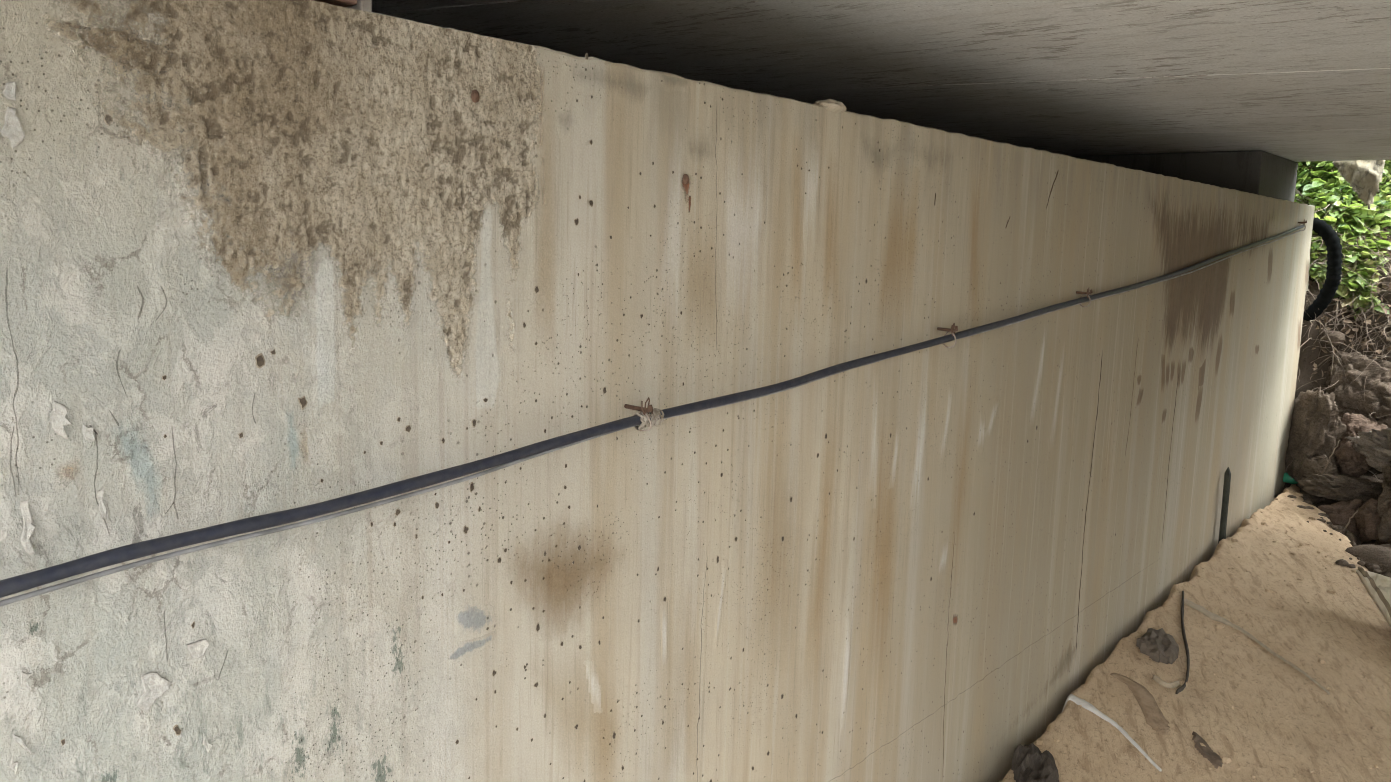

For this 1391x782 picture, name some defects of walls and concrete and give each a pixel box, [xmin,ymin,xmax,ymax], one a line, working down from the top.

peeling [0,82,25,149]
water stain [310,253,340,414]
water stain [1135,286,1236,431]
peeling [50,401,96,442]
peeling [20,500,36,555]
water stain [486,491,638,782]
peeling [137,672,170,713]